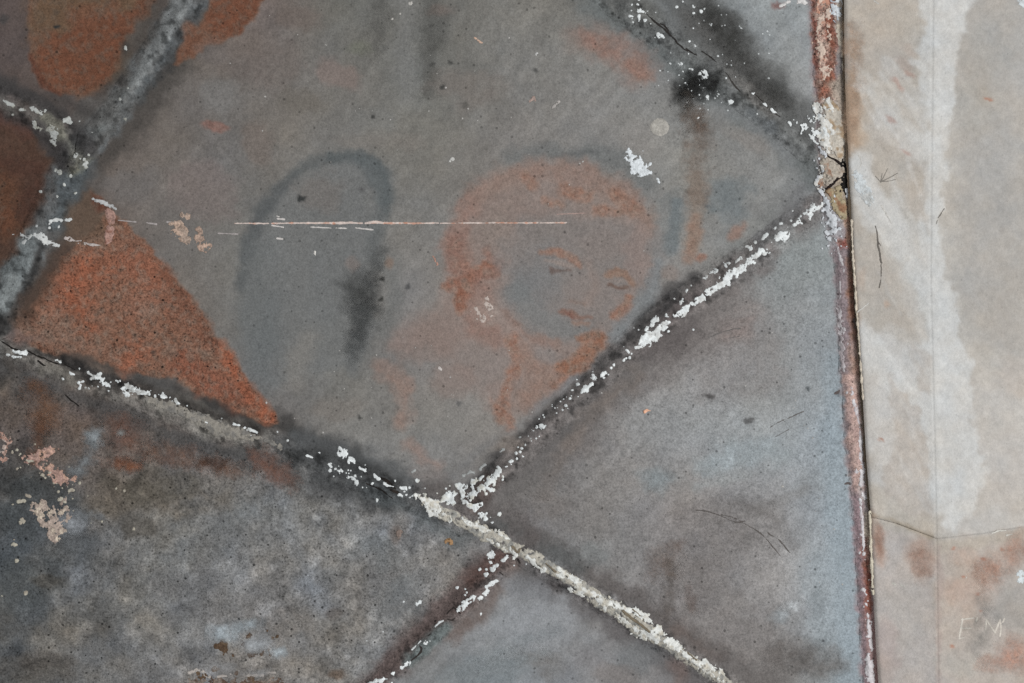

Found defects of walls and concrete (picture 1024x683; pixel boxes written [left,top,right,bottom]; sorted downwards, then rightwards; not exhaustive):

leakage [674,72,719,128]
crack [646,13,780,117]
flaking render [168,212,212,253]
crack [822,0,882,514]
flaking render [0,432,81,544]